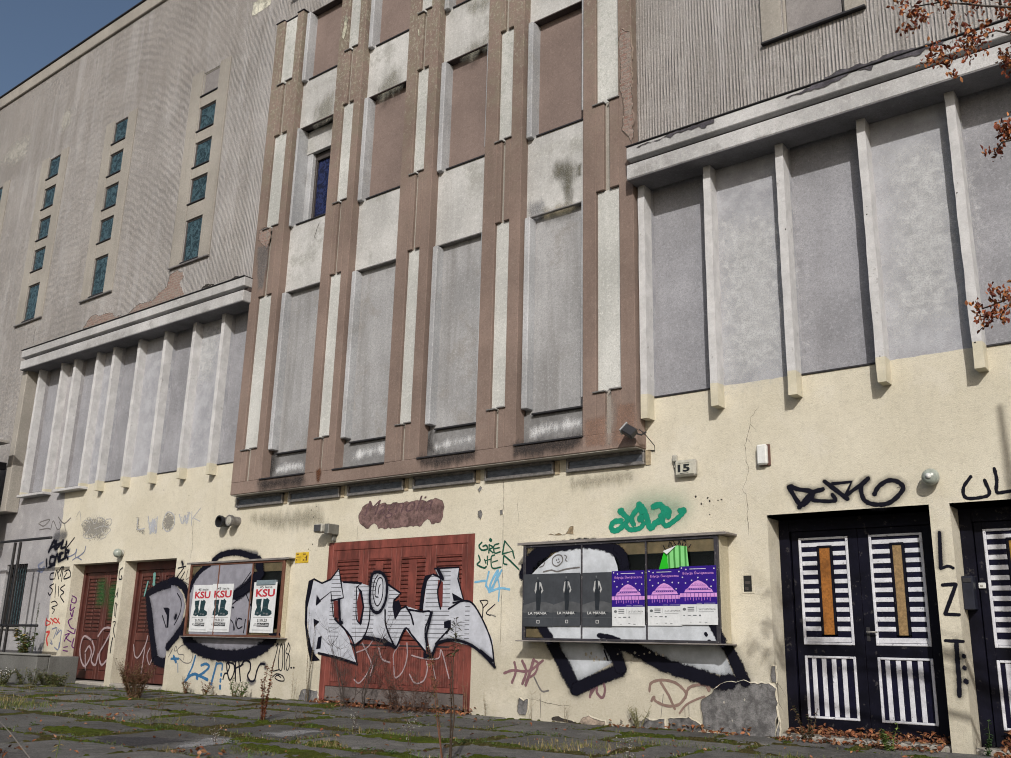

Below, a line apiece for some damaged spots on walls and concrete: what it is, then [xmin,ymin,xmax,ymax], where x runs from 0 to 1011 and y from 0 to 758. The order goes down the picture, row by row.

spalling [618,28,714,147]
leakage [530,163,581,216]
spalling [83,270,185,329]
spalling [633,665,782,738]